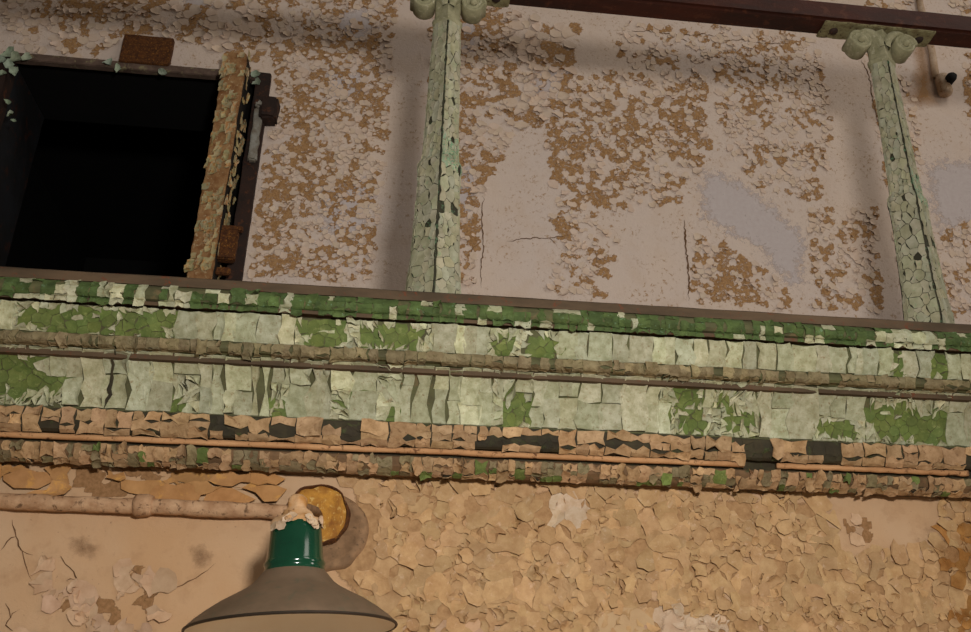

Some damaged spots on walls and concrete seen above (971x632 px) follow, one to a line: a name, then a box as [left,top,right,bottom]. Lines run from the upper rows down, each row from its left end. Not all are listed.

peeling [0,0,398,283]
peeling [459,6,894,314]
peeling [934,219,971,318]
peeling [962,52,971,117]
crack [0,522,32,577]
peeling [0,277,971,632]